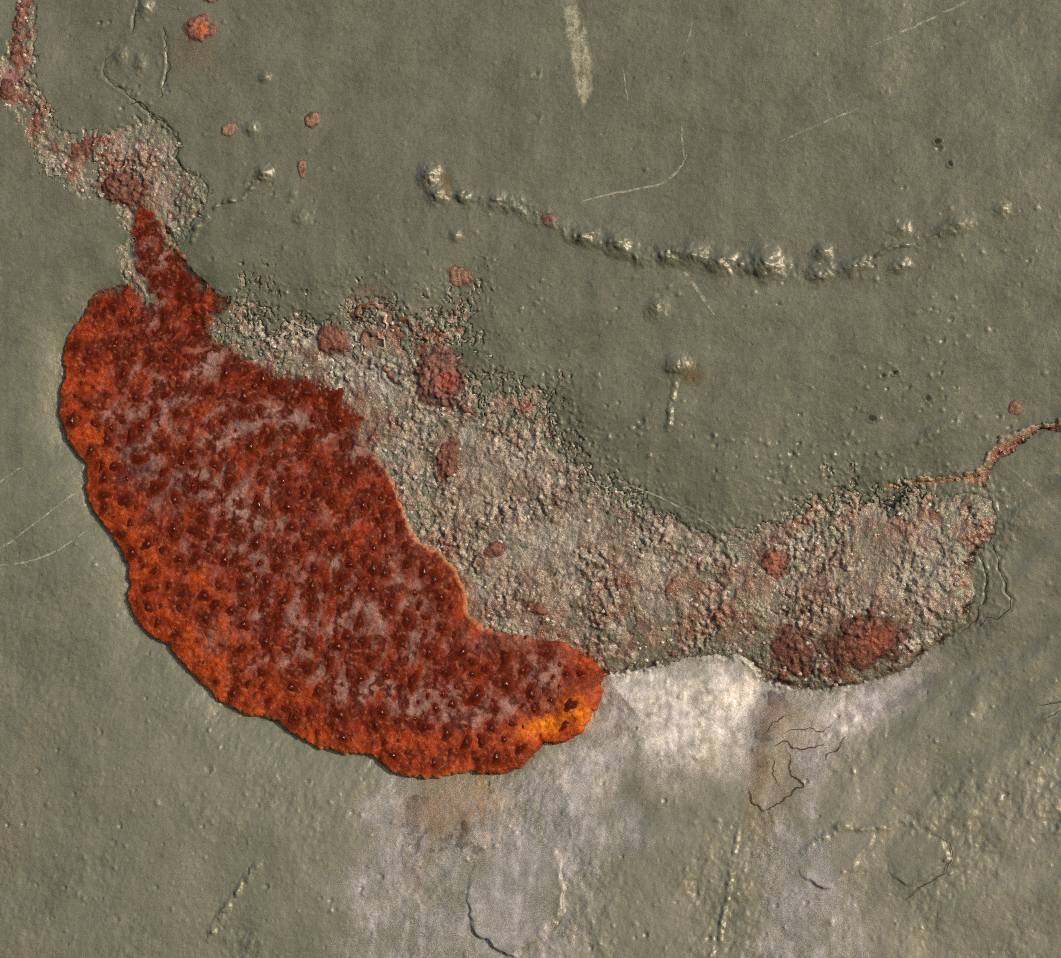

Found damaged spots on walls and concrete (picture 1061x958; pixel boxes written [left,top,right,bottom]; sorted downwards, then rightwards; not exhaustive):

corrosion [182,0,218,42]
peeling [0,0,213,308]
corrosion [59,203,608,780]
peeling [205,273,997,691]
crack [886,418,1061,488]
damp [781,668,921,763]
damp [508,664,762,884]
damp [351,844,408,935]
damp [458,876,562,958]